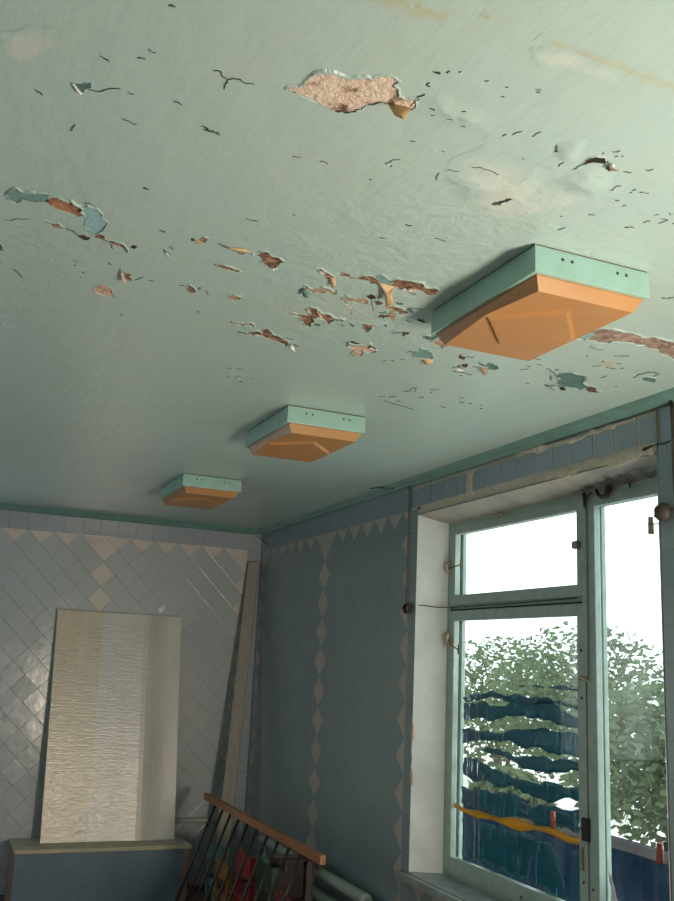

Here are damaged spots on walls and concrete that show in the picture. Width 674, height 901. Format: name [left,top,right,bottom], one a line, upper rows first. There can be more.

crack [213,70,254,90]
peeling [284,69,461,120]
peeling [5,187,137,253]
peeling [214,263,243,273]
peeling [219,244,285,271]
peeling [289,267,448,365]
peeling [231,322,298,352]
peeling [453,355,500,376]
peeling [520,358,603,393]
peeling [577,327,674,378]
peeling [633,372,660,383]